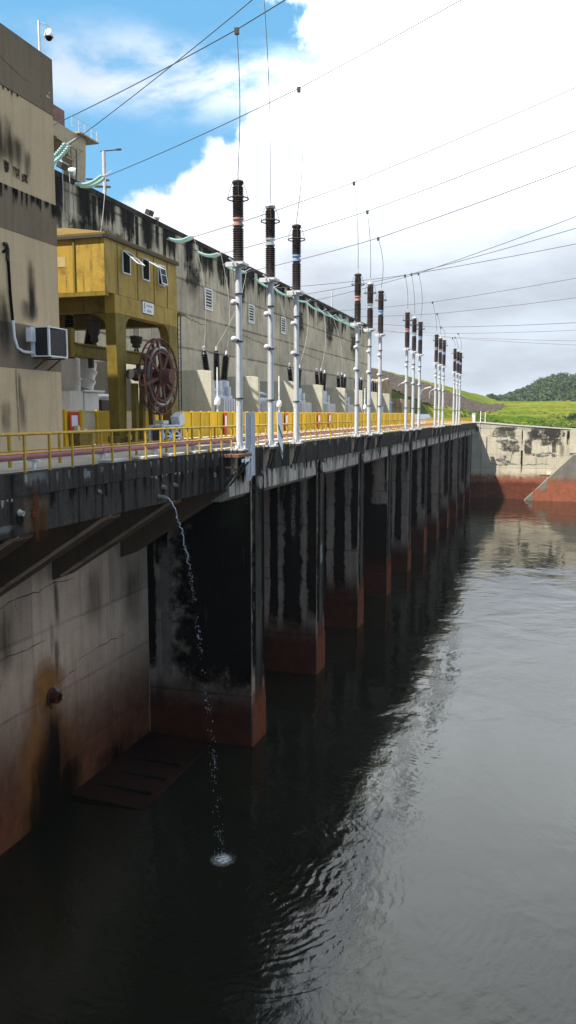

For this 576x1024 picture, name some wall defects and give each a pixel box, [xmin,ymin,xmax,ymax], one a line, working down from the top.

damp [0,131,366,351]
damp [493,426,570,465]
damp [147,426,479,693]